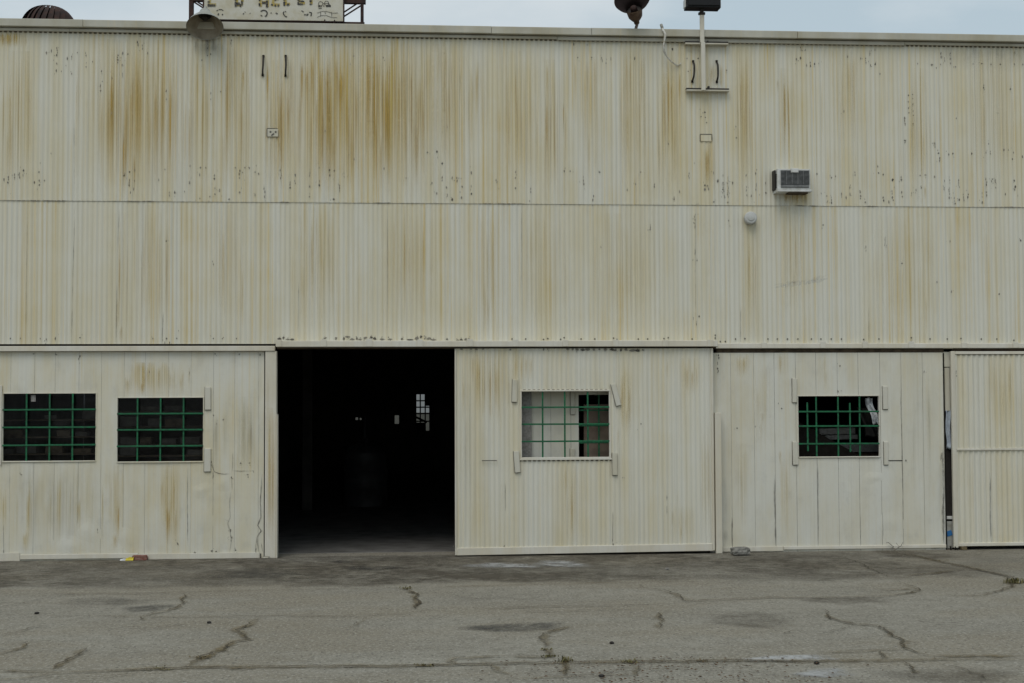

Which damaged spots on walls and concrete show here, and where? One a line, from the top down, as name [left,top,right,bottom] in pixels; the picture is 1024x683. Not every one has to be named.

corrosion [374,56,399,138]
crack [115,597,1007,678]